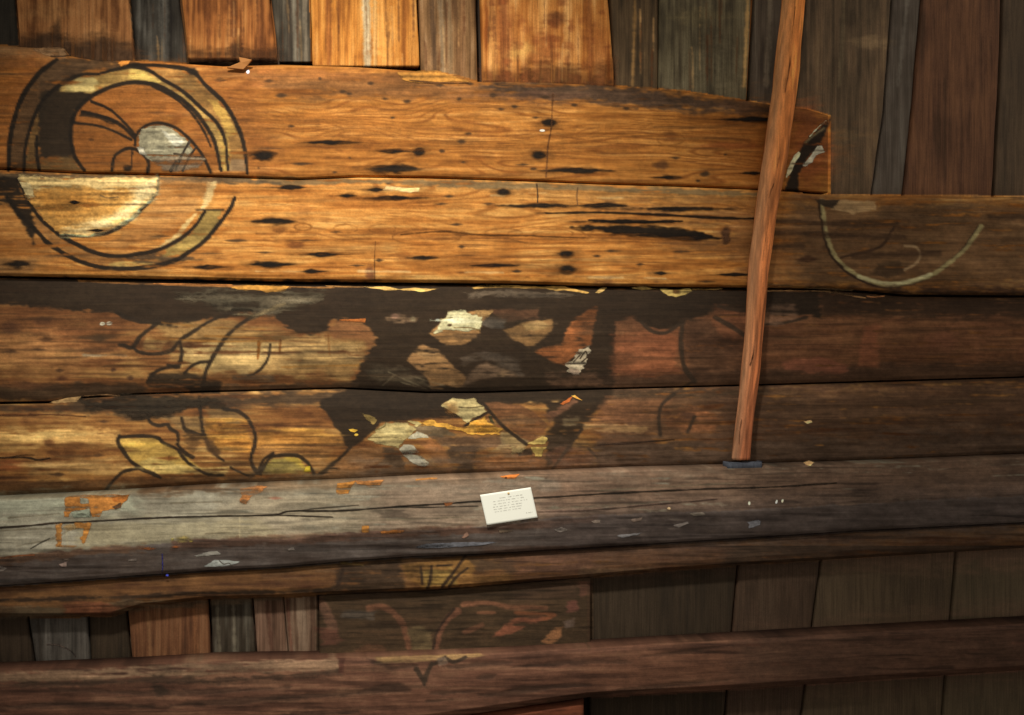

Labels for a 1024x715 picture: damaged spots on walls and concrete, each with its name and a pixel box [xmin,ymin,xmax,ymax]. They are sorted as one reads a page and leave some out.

peeling [786,125,825,178]
peeling [434,310,493,334]
peeling [565,347,591,374]
peeling [349,398,503,480]
peeling [511,436,548,457]
peeling [55,495,129,547]
crack [0,500,481,549]
crack [533,482,837,512]